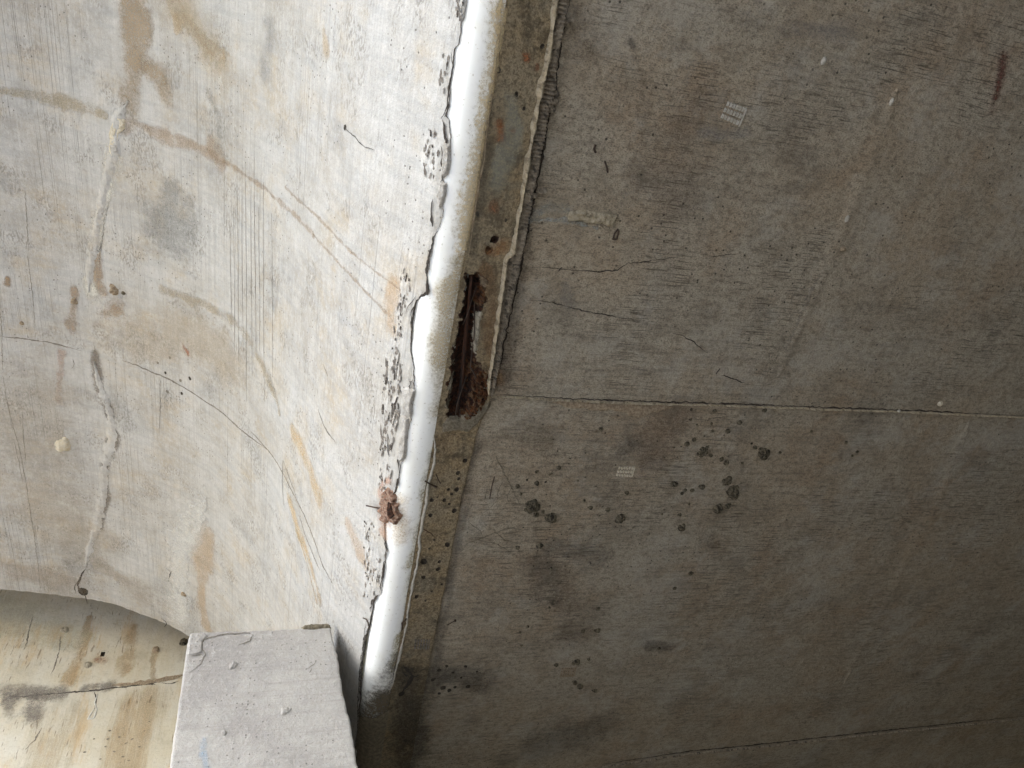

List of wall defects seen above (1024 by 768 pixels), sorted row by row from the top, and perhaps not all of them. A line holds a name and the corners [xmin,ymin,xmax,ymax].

peeling [363,53,453,611]
spalling [443,268,492,420]
crack [74,570,87,601]